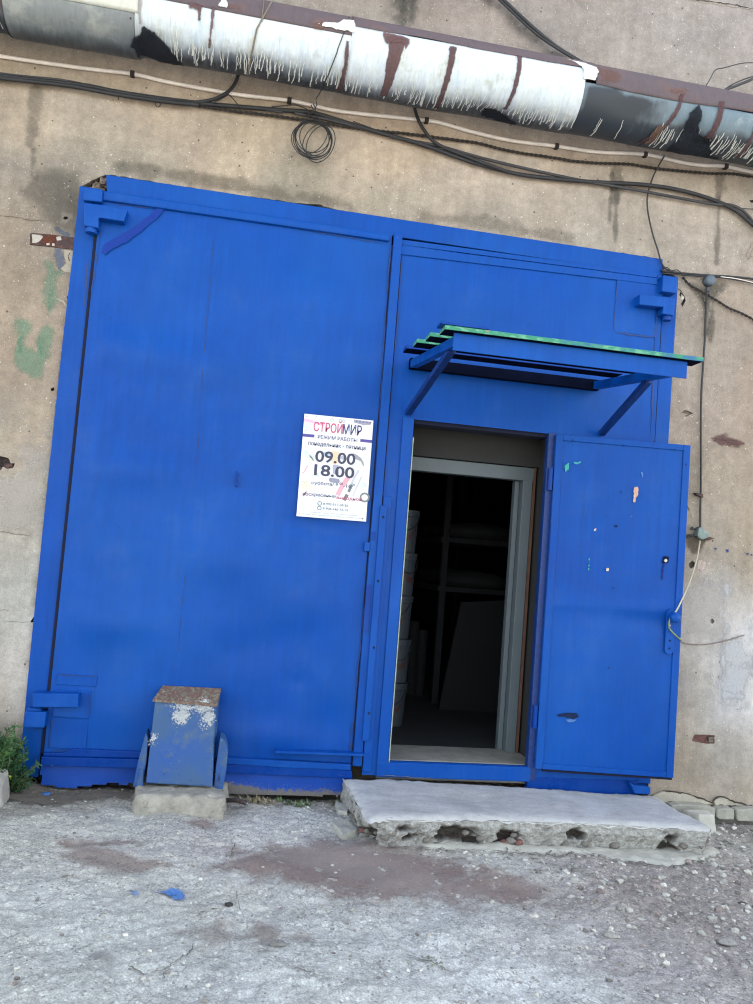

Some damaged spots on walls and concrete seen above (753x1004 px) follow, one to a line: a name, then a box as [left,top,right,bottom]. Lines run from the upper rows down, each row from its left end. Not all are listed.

crack [693,0,753,10]
corrosion [189,2,215,48]
peeling [319,19,356,33]
corrosion [380,32,410,97]
corrosion [637,94,684,145]
corrosion [705,101,724,140]
spalling [0,456,15,470]
spalling [692,734,715,744]
spalling [330,779,711,856]